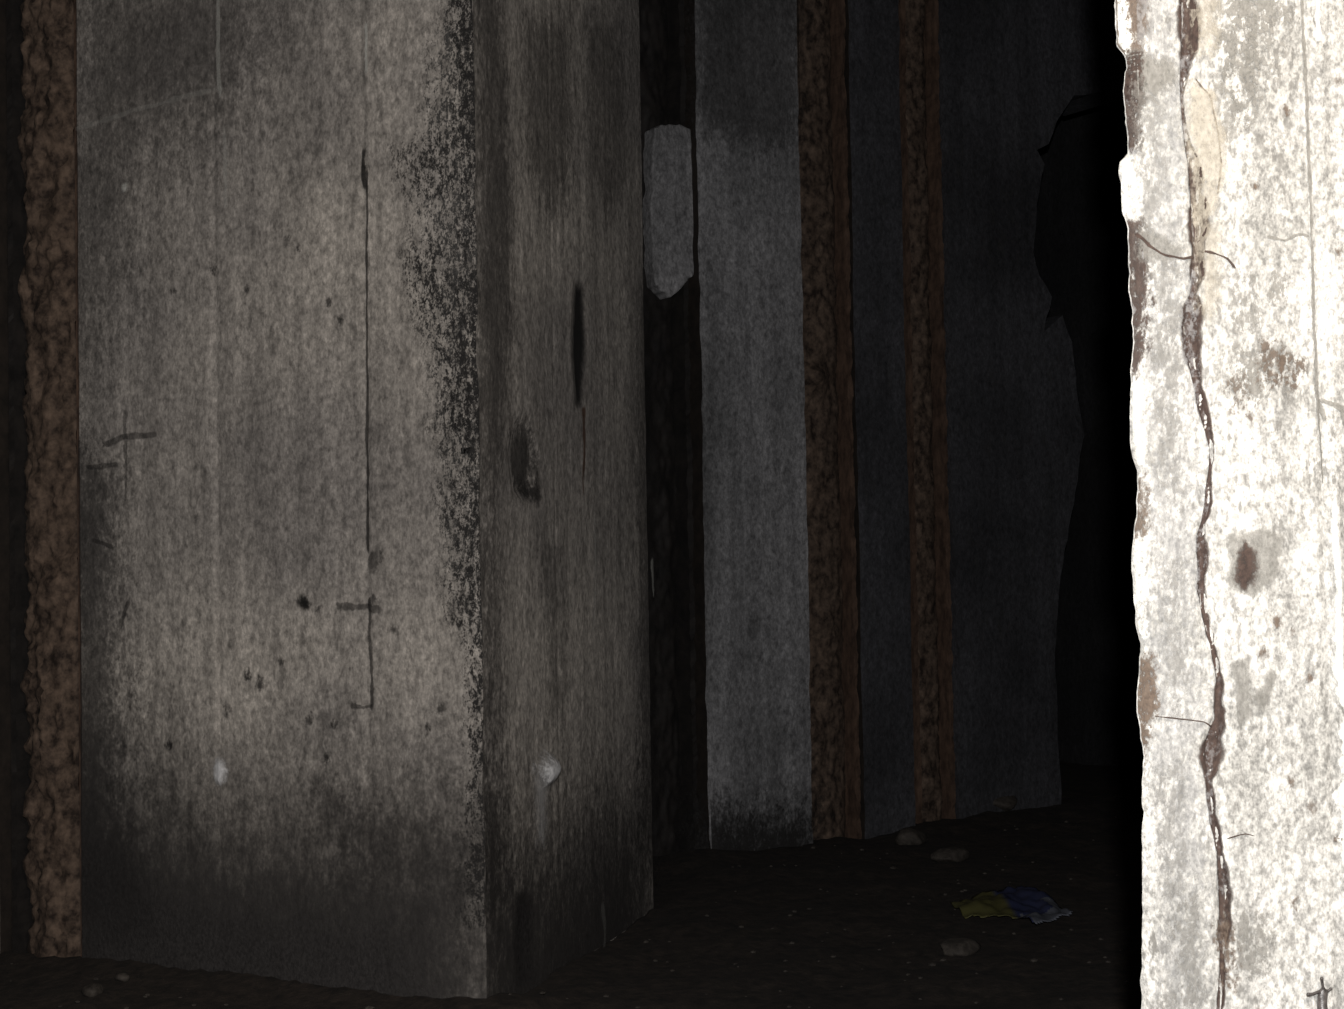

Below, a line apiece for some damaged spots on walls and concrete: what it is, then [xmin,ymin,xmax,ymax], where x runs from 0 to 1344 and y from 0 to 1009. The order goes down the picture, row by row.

spalling [1116,0,1181,380]
spalling [1135,473,1150,538]
crack [1136,0,1254,1009]
spalling [1138,652,1160,764]